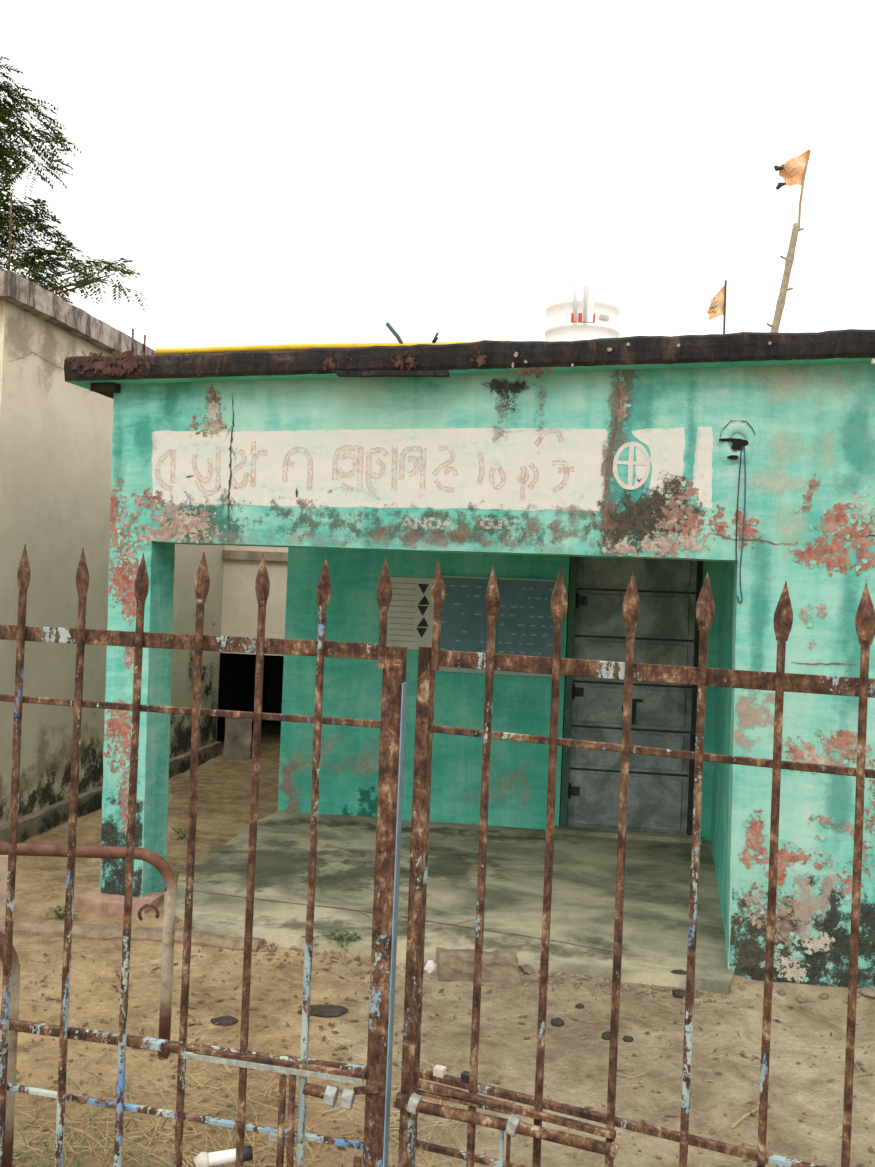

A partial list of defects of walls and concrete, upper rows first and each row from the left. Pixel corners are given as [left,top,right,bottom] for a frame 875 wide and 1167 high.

peeling [66,328,159,376]
peeling [108,471,227,626]
crack [223,394,236,532]
water stain [482,378,546,439]
rust [599,370,635,555]
peeling [598,477,759,558]
peeling [788,473,875,581]
water stain [169,651,218,778]
water stain [0,733,143,897]
peeling [738,729,875,984]
water stain [730,875,875,988]